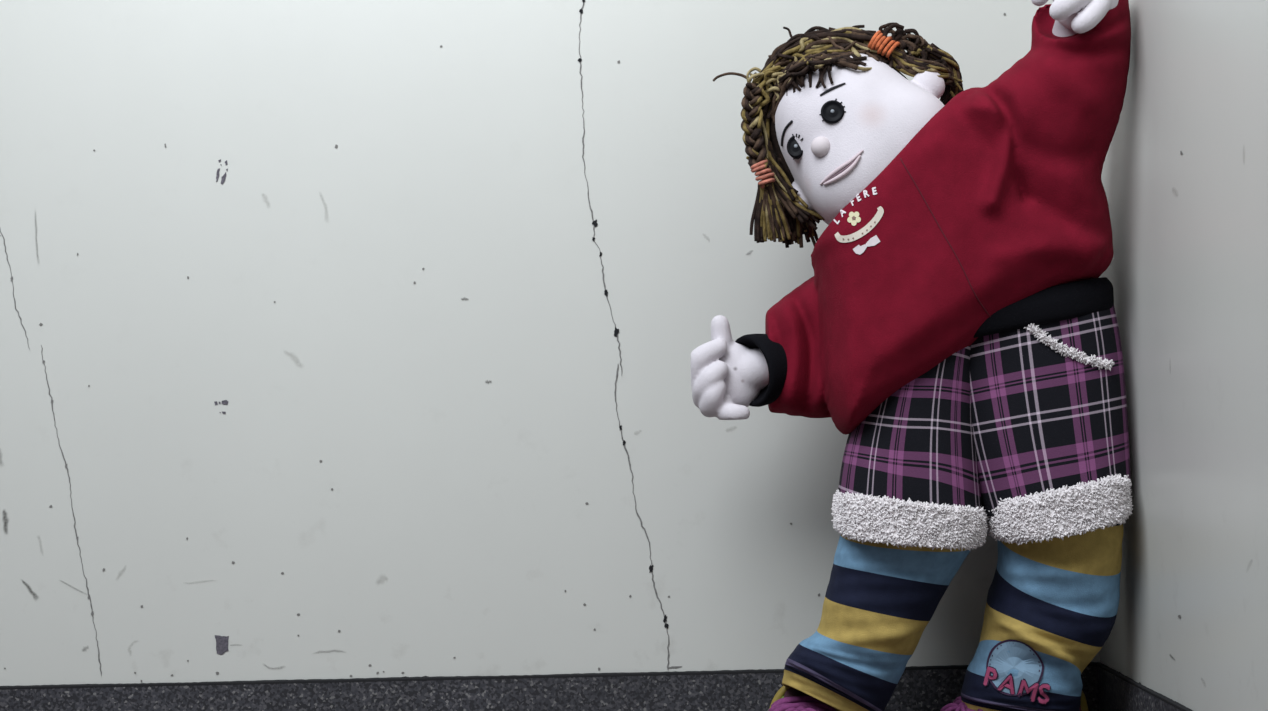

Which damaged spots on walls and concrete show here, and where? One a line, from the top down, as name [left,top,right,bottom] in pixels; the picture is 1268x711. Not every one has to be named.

crack [0,229,102,676]
crack [578,0,682,669]